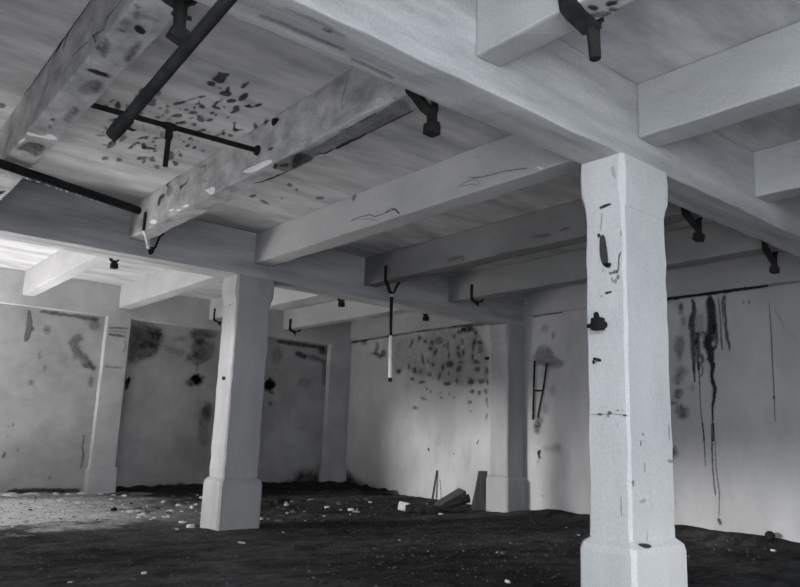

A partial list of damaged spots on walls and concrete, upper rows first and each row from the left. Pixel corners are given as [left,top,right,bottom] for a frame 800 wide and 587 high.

peeling [131,136,165,169]
peeling [139,72,262,166]
leakage [129,326,160,362]
leakage [411,324,488,412]
leakage [688,295,730,499]